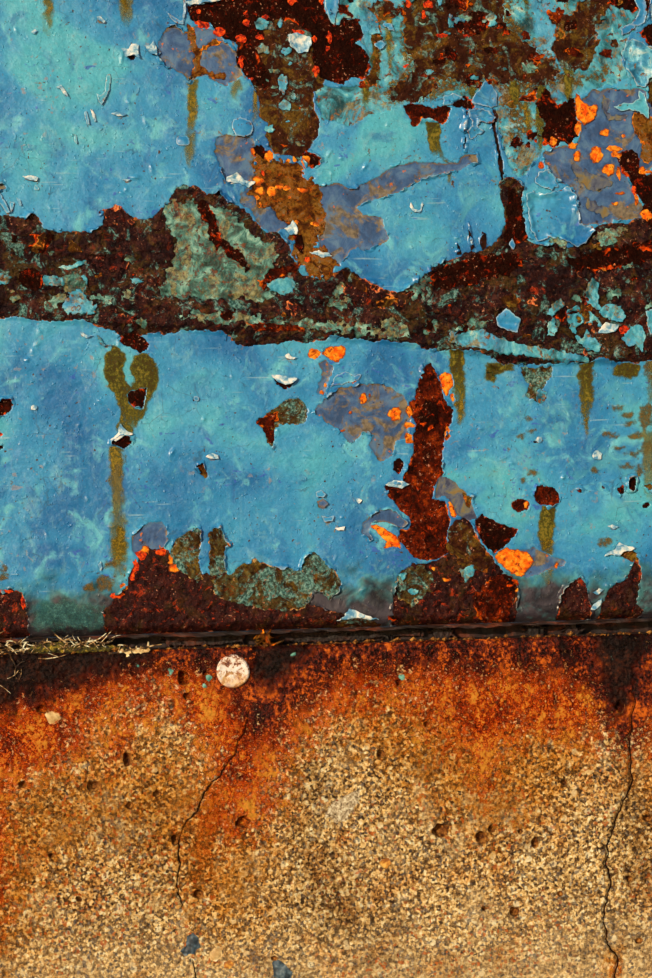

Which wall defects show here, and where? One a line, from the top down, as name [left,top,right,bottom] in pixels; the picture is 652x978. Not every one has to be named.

peeling [121,22,243,86]
peeling [315,0,652,247]
peeling [214,133,288,233]
peeling [318,151,481,264]
peeling [455,221,487,255]
rust [0,0,652,638]
peeling [271,375,297,389]
peeling [308,345,410,462]
peeling [605,542,636,556]
crack [176,709,250,909]
rust [0,633,652,925]
crack [603,694,635,978]